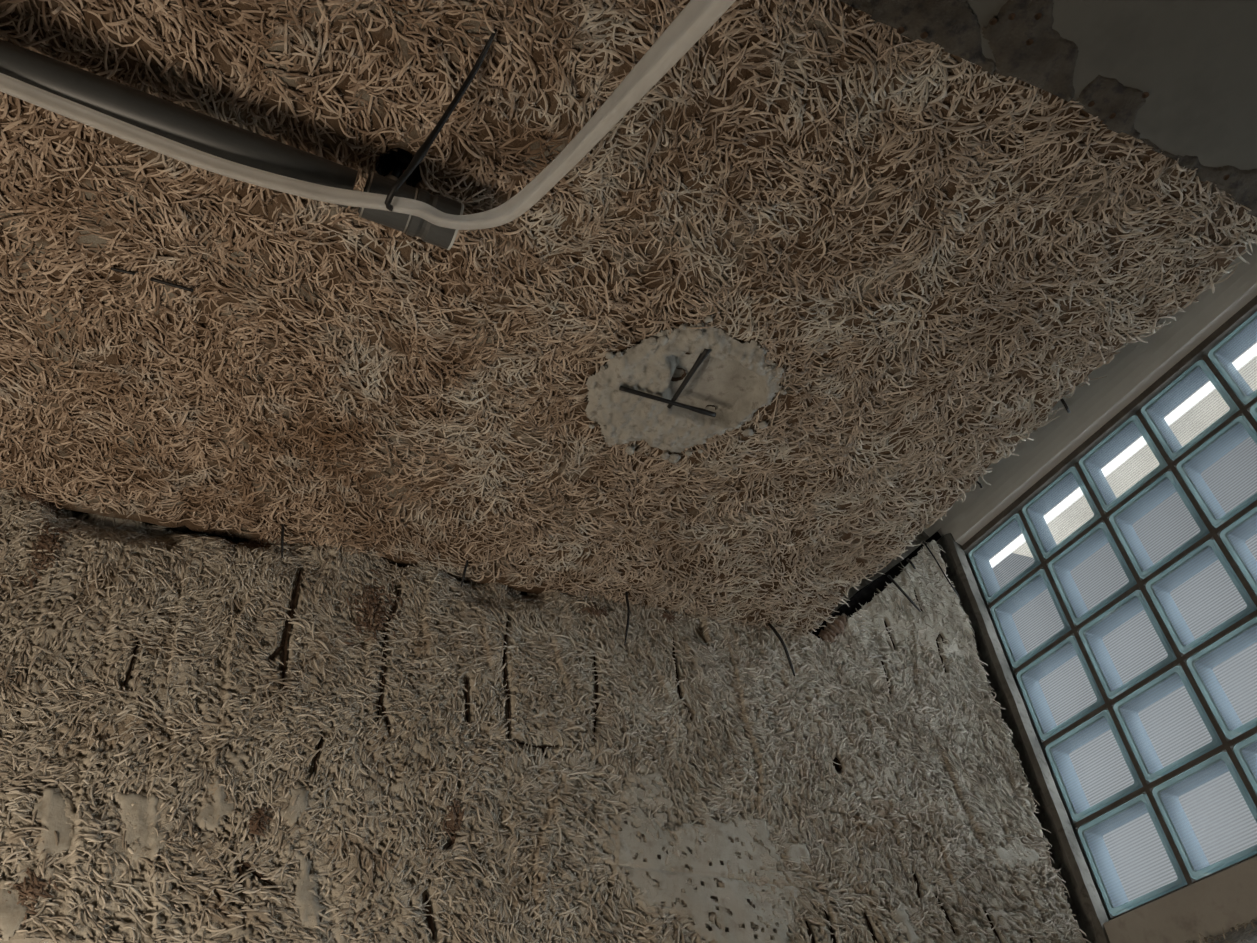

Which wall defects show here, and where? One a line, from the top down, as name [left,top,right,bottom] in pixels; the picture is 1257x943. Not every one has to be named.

peeling [840,0,1257,217]
spalling [585,315,787,464]
crack [124,641,138,686]
crack [268,569,301,686]
crack [377,585,400,730]
crack [462,677,470,722]
crack [502,617,558,756]
crack [591,656,599,737]
crack [672,638,692,719]
crack [313,737,323,773]
crack [237,861,272,894]
crack [424,894,435,940]